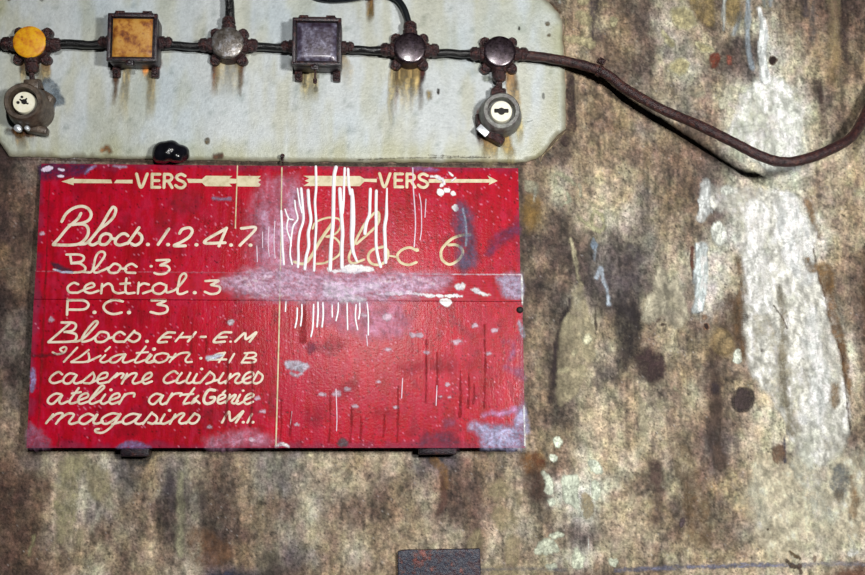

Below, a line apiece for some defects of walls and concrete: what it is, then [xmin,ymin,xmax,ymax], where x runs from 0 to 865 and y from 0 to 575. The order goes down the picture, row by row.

rust [110,63,131,97]
rust [143,67,160,98]
rust [210,53,246,88]
rust [291,61,317,89]
rust [389,58,431,100]
rust [506,73,520,104]
efflorescence [719,0,803,172]
rust [11,128,34,143]
rust [475,121,522,155]
water stain [625,309,666,381]
water stain [692,179,865,555]